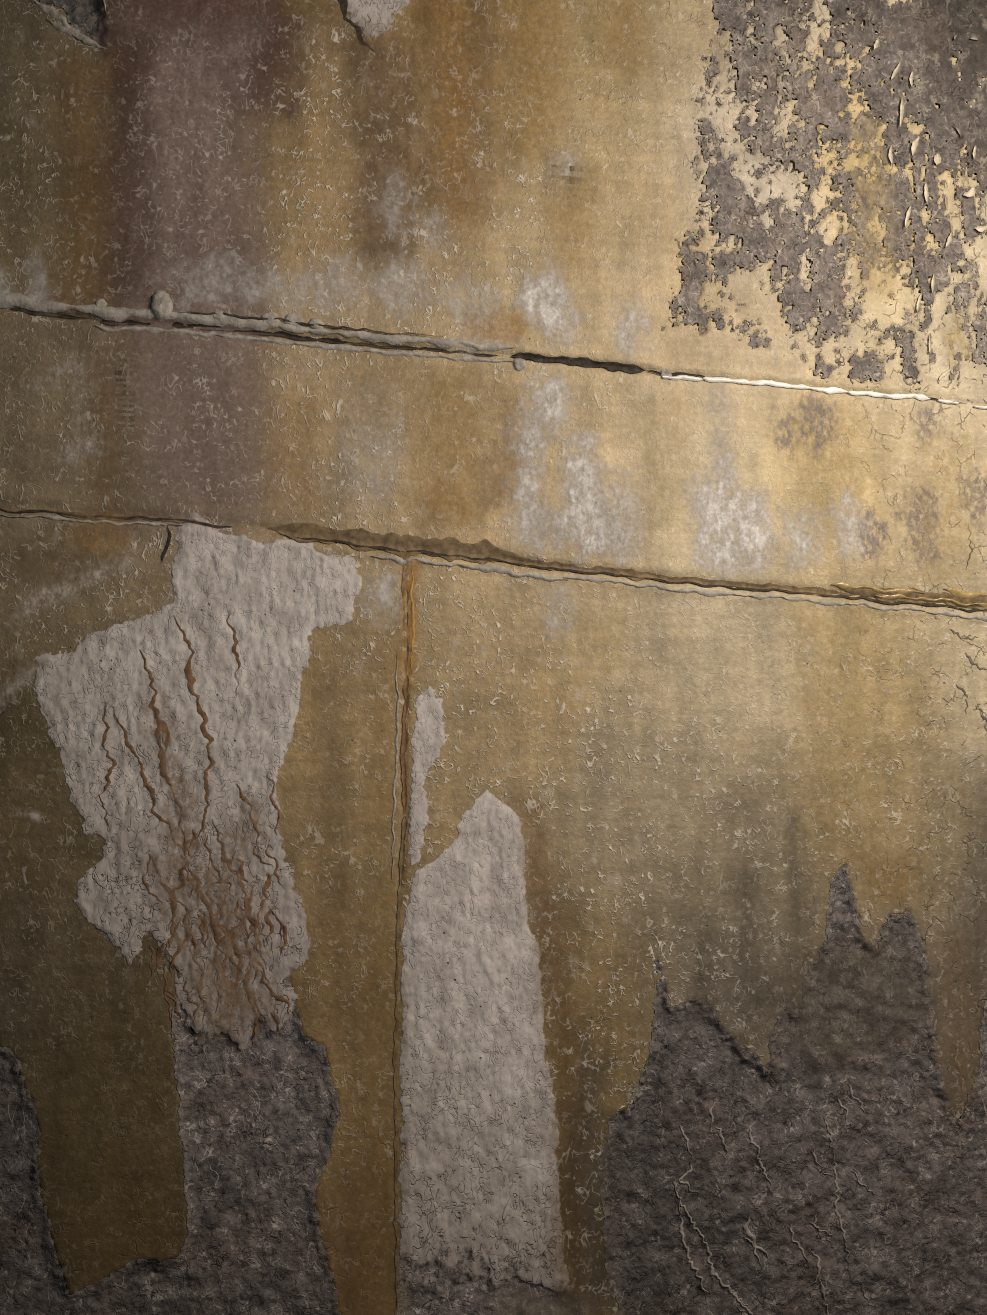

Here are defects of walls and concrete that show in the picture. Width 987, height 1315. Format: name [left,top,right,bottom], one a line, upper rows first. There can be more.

crack [0,505,232,561]
crack [0,290,987,409]
leakage [518,272,579,344]
leakage [516,377,635,563]
leakage [686,453,773,573]
peeling [662,0,987,390]
leakage [839,494,886,558]
flaking render [0,512,362,1315]
corrosion [99,615,290,1051]
flaking render [394,686,585,1315]
crack [268,523,987,1315]
spalling [598,863,987,1315]